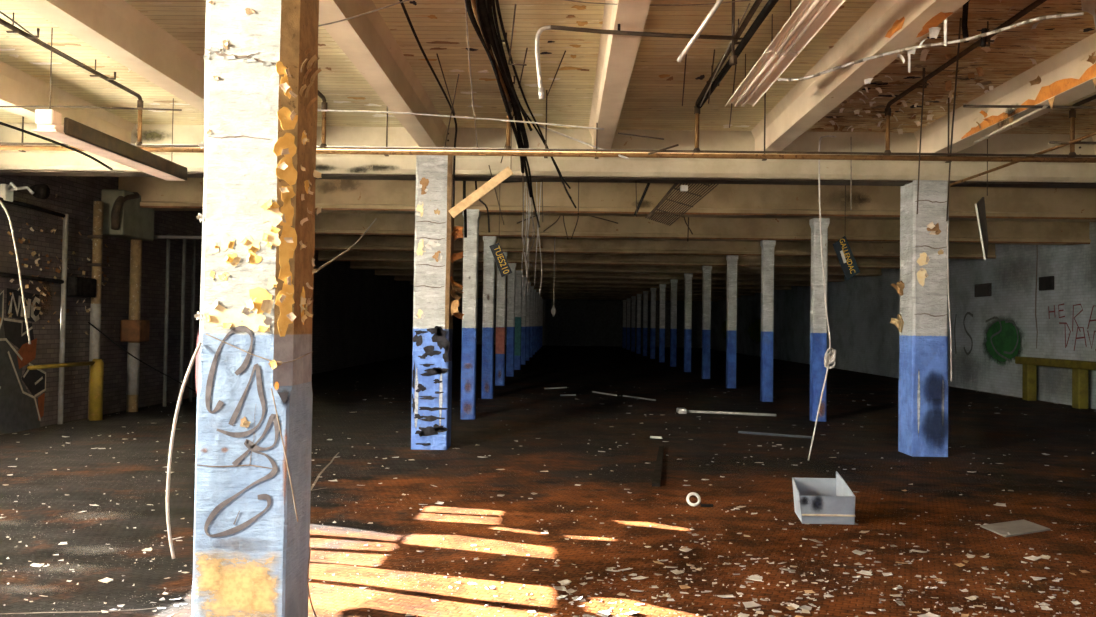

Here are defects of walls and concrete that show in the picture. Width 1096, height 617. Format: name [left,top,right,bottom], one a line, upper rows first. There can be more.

crack [203,40,276,66]
peeling [811,12,1096,139]
peeling [194,44,331,337]
peeling [927,221,941,235]
spalling [891,281,905,296]
peeling [917,249,944,286]
spalling [890,314,904,332]
peeling [412,309,450,446]
water stain [923,373,948,447]
peeling [195,554,277,617]